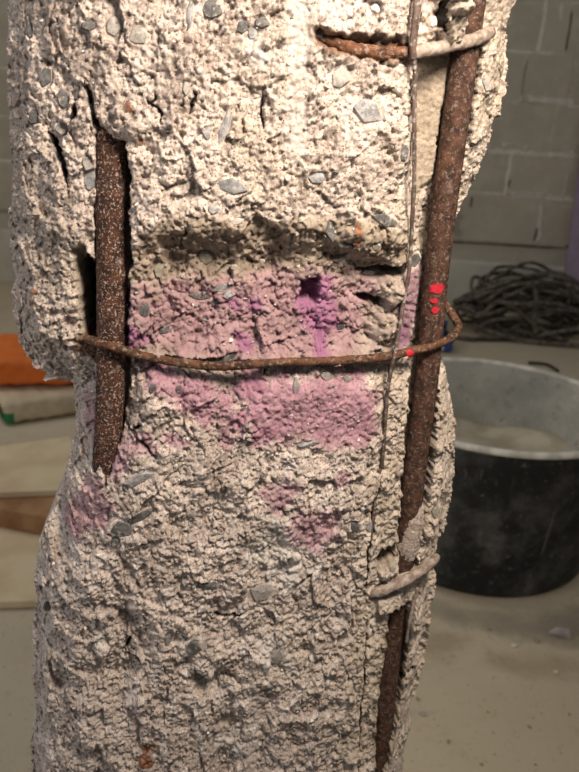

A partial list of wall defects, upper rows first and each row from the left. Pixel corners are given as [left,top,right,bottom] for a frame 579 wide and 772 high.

spalling [465,0,486,34]
crack [48,131,69,187]
crack [70,80,98,131]
crack [147,95,163,123]
corrosion [75,316,96,357]
spalling [92,120,402,484]
spalling [396,45,480,574]
crack [365,465,382,581]
crack [358,619,367,771]
spalling [374,602,407,772]